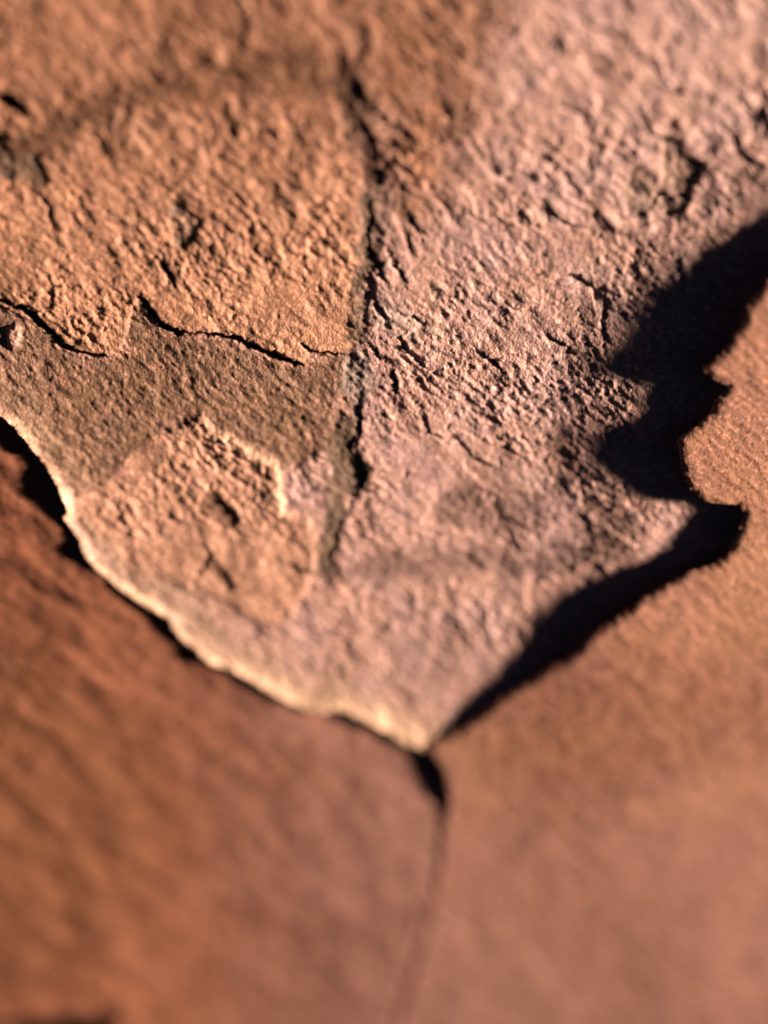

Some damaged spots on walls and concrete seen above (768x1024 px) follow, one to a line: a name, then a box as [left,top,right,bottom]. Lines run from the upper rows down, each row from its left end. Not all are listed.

crack [0,94,27,115]
crack [356,84,411,185]
crack [154,256,177,287]
spalling [170,201,200,247]
crack [375,218,422,274]
crack [0,298,107,357]
crack [137,295,343,364]
crack [375,347,399,394]
crack [355,405,363,444]
spalling [0,311,342,709]